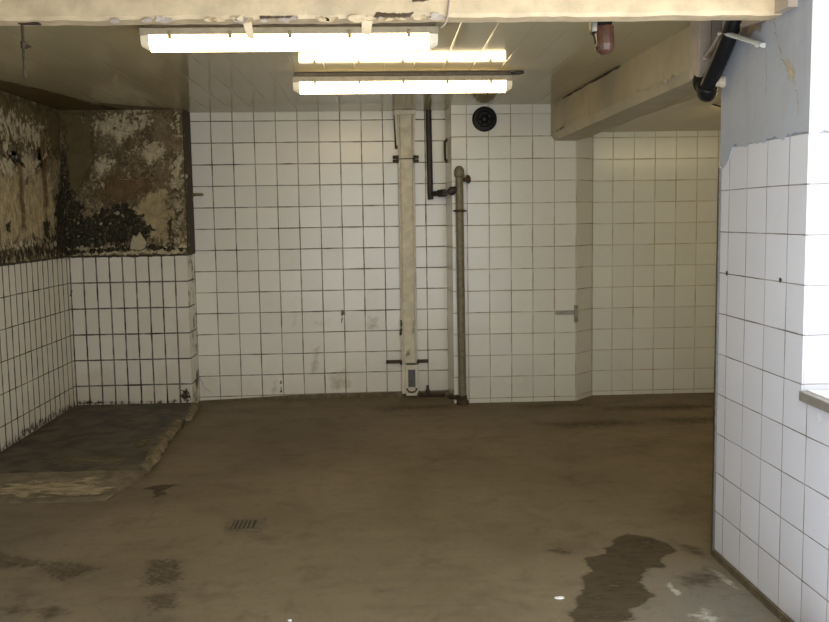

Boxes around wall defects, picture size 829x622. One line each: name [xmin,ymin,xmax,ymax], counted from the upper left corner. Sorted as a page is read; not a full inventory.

leakage [0,81,162,110]
leakage [0,130,187,265]
peeling [0,100,190,266]
leakage [569,535,675,622]